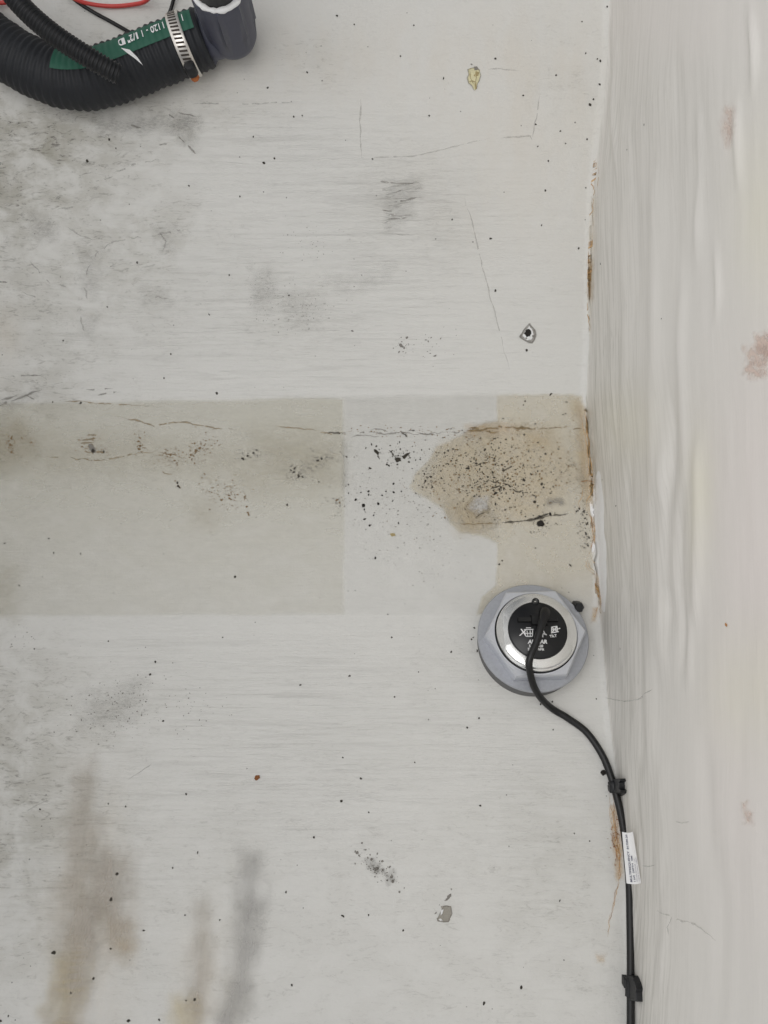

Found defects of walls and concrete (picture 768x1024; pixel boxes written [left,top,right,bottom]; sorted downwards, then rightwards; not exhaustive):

crack [65,401,230,429]
crack [278,423,580,439]
leakage [280,420,582,563]
rust [607,797,621,931]